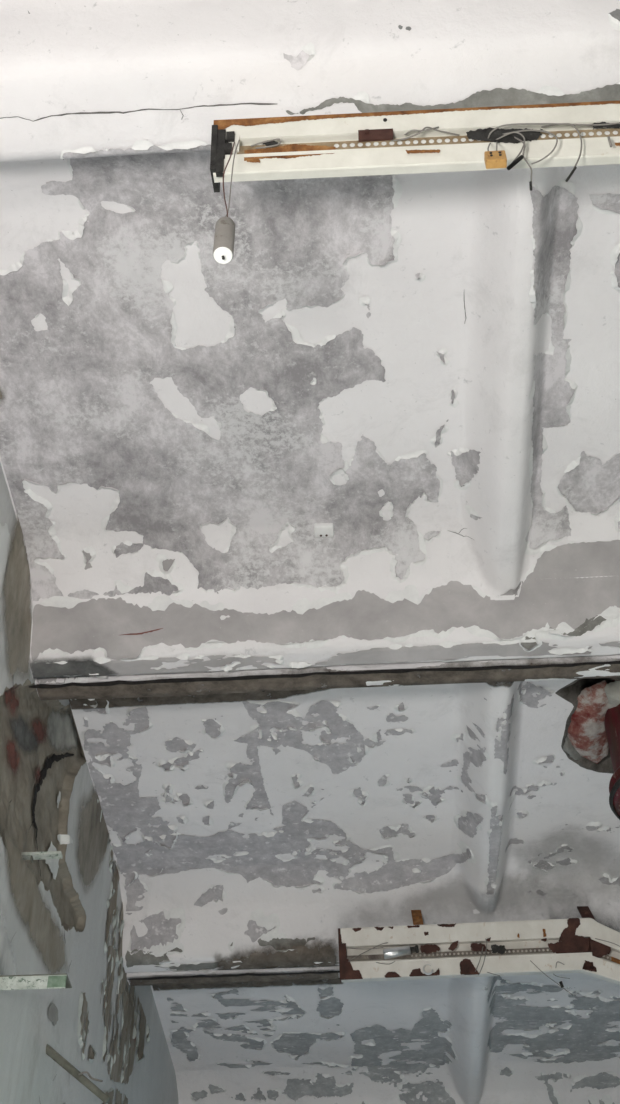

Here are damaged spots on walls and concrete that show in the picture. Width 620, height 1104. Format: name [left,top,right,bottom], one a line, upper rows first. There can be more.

rust [213,100,620,130]
rust [244,144,336,163]
peeling [0,139,620,684]
water stain [4,518,620,709]
spalling [397,664,620,895]
flaking render [0,679,479,1104]
rust [420,944,440,954]
rust [470,943,506,955]
peeling [541,918,587,944]
rust [543,929,620,964]
peeling [582,960,597,972]
peeling [482,976,620,1104]